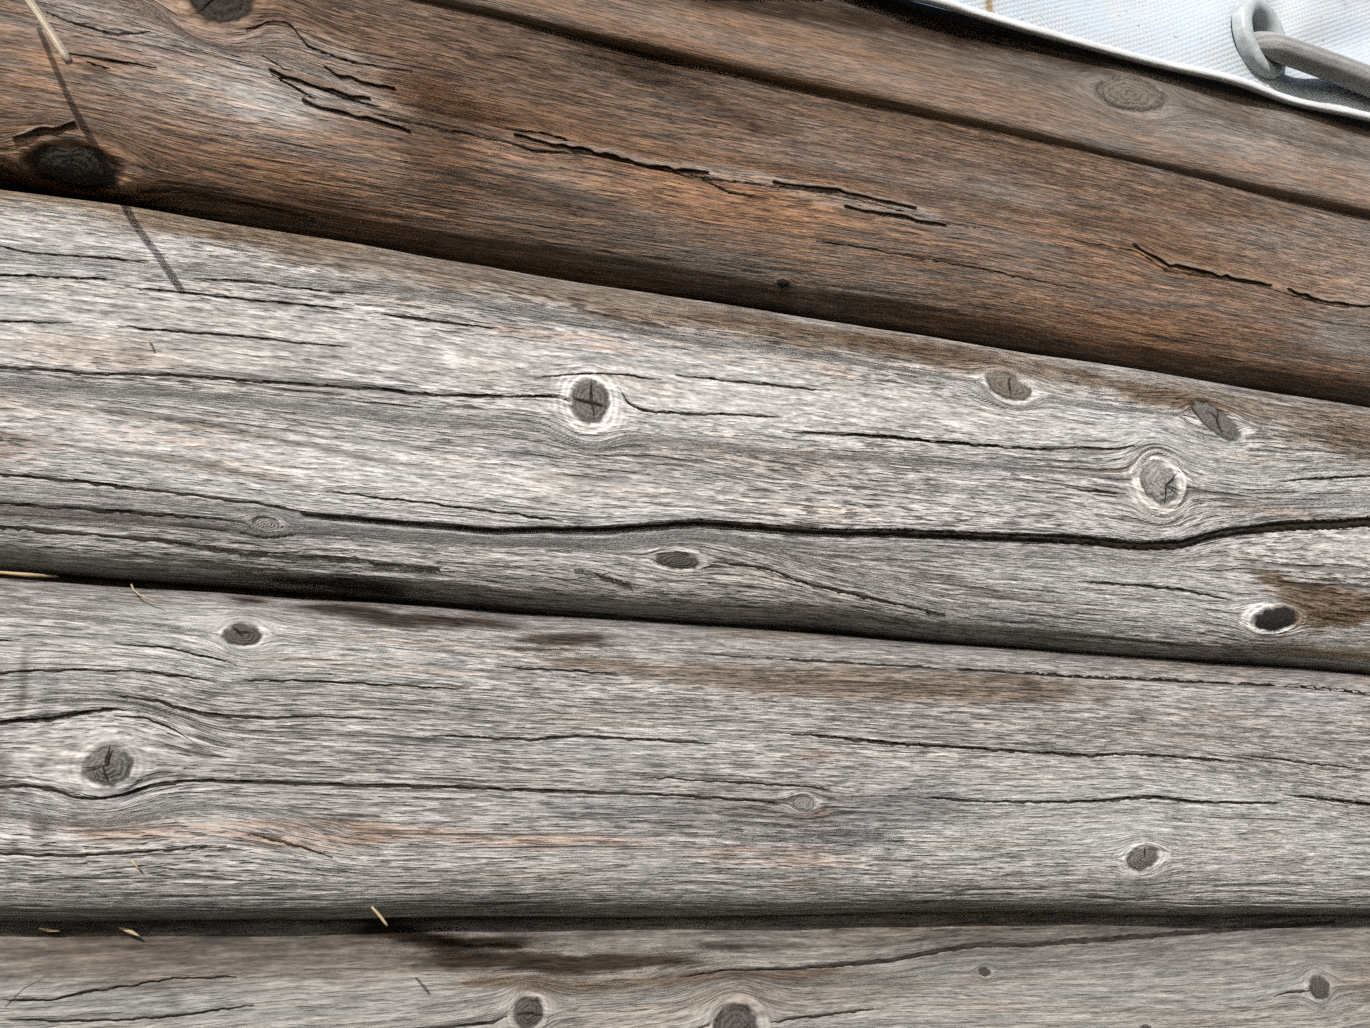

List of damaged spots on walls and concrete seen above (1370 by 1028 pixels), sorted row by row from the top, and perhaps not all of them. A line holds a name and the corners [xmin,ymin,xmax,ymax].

crack [245,20,981,228]
crack [821,240,1073,288]
crack [1075,240,1349,308]
crack [0,473,1370,569]
crack [575,569,632,585]
crack [709,560,945,615]
crack [1083,580,1236,602]